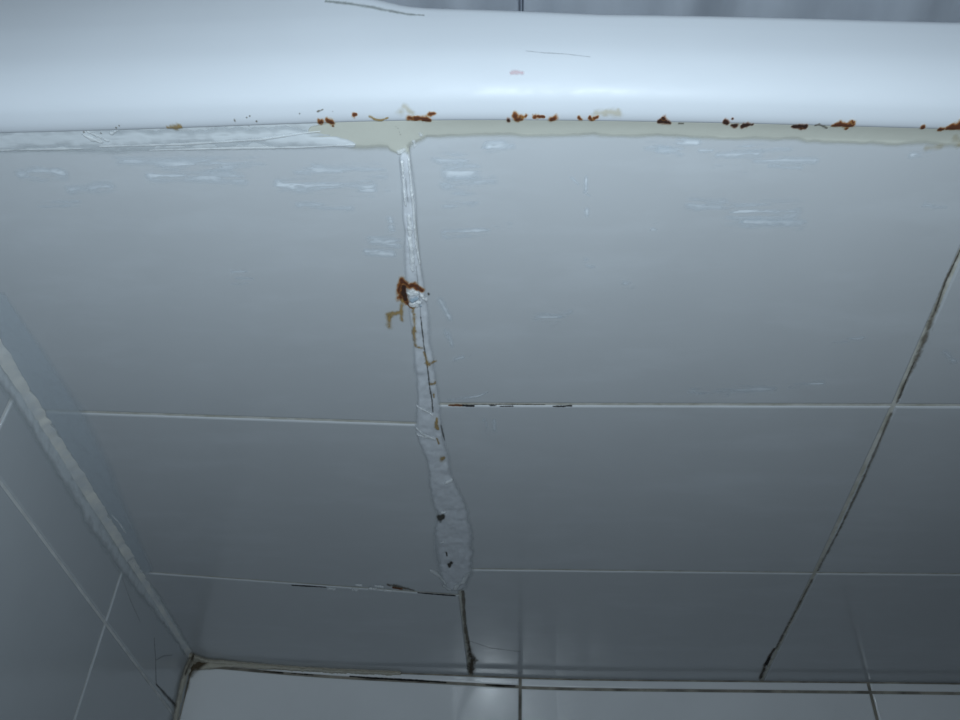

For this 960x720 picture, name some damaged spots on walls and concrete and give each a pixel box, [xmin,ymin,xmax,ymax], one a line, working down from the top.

rust [407,112,436,122]
rust [507,112,557,122]
rust [791,120,855,130]
rust [937,121,960,131]
rust [387,277,436,366]
crack [420,317,445,440]